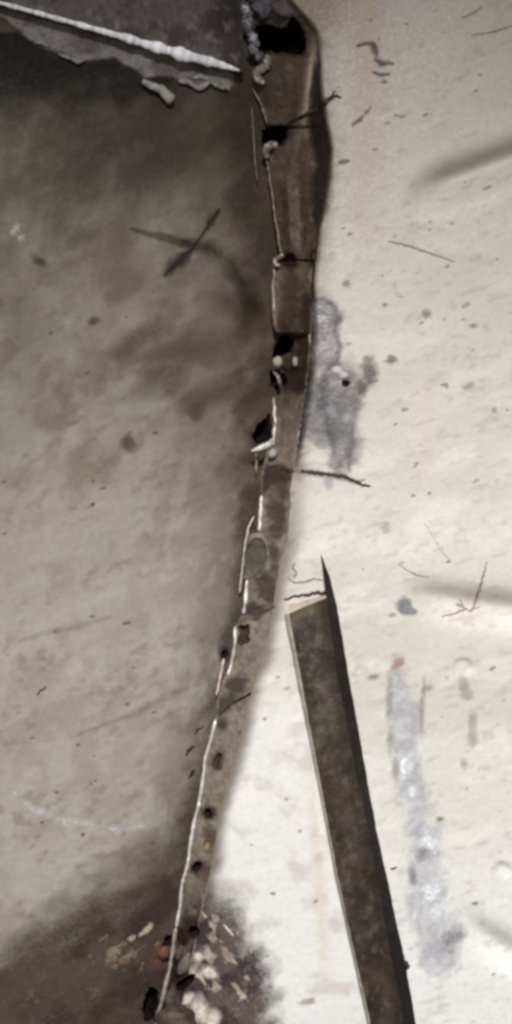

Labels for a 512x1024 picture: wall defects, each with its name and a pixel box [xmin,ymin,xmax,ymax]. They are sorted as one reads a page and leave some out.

peeling [251,438,272,452]
crack [276,465,370,487]
peeling [100,923,159,972]
peeling [182,912,249,1024]